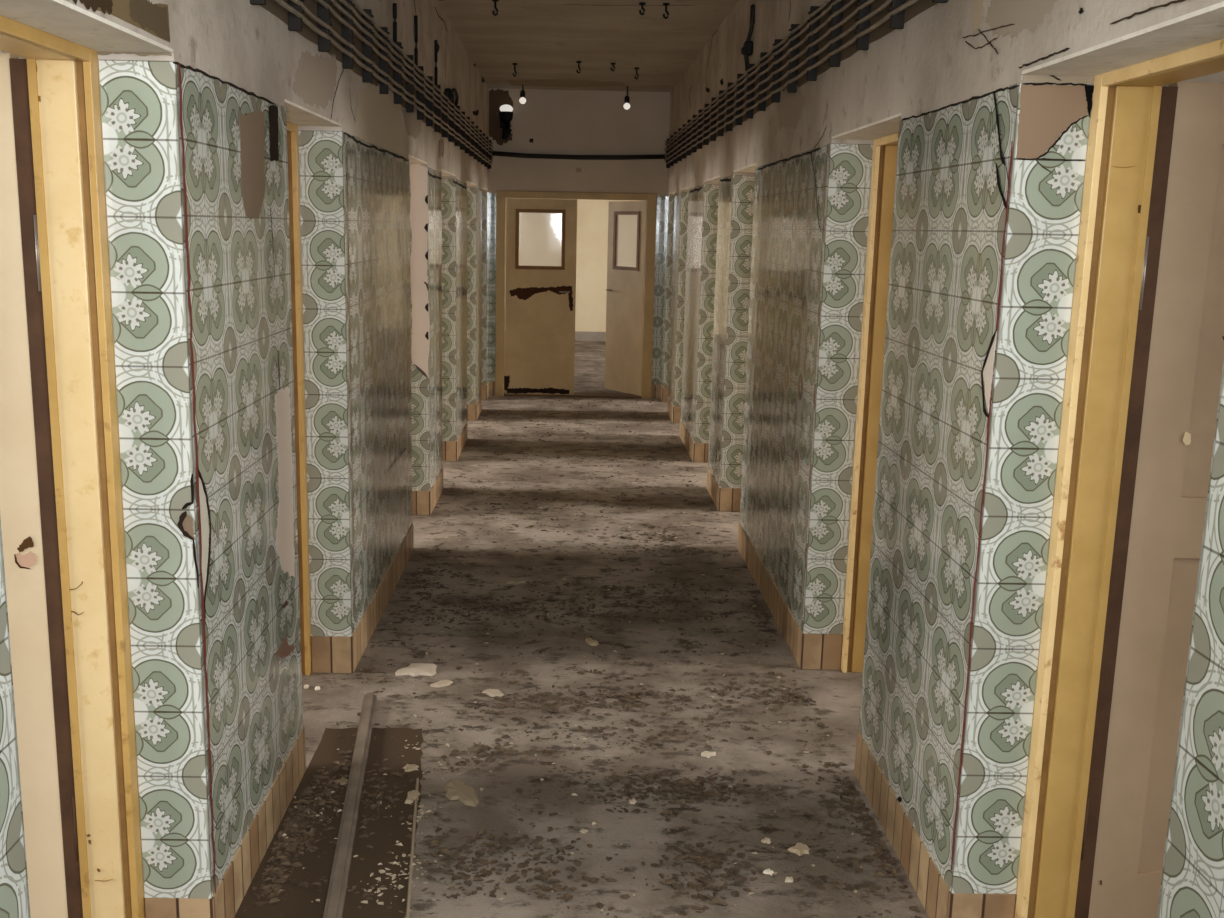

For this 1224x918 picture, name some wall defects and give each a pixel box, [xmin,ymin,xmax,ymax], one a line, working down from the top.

flaking render [68,0,172,56]
peeling [239,104,279,219]
peeling [1016,75,1094,159]
crack [177,471,211,619]